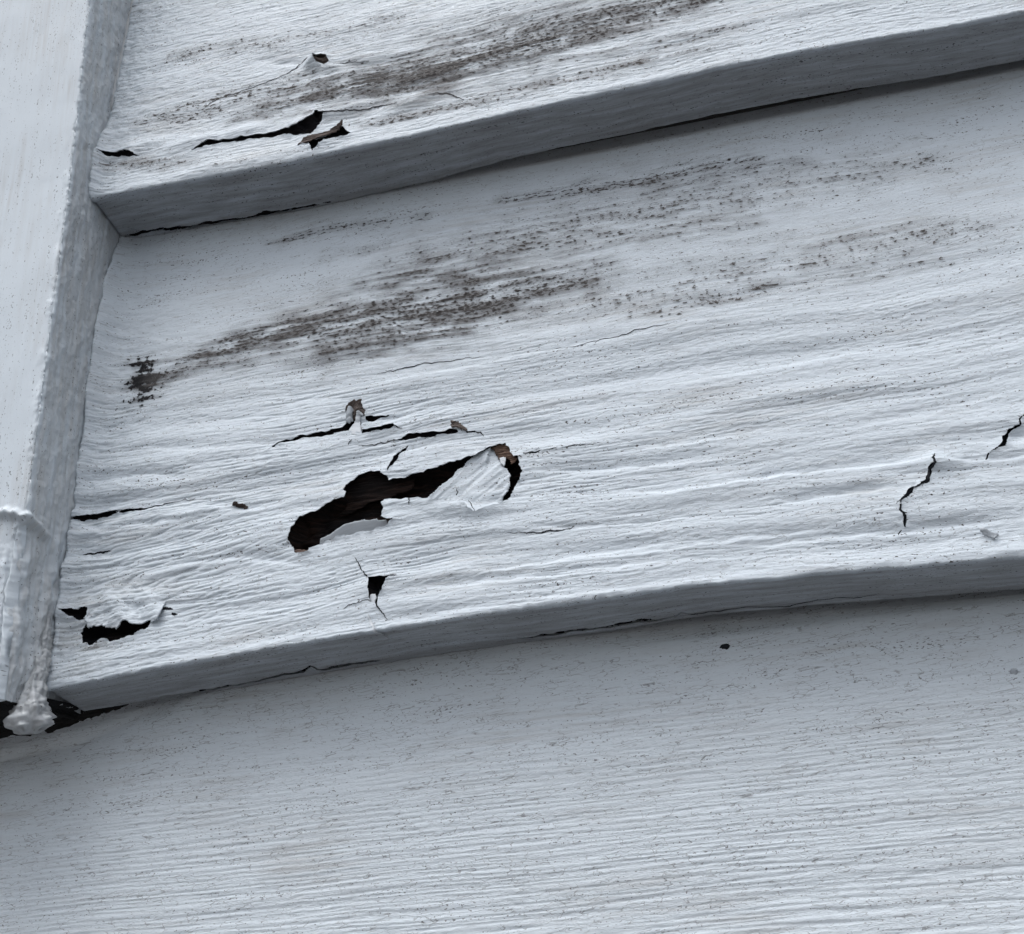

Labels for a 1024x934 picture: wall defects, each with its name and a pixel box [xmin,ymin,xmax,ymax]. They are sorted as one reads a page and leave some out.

peeling [297,119,351,150]
mould [115,150,996,411]
crack [985,415,1024,460]
crack [71,498,195,522]
peeling [287,443,527,553]
crack [896,453,937,535]
peeling [58,581,177,649]
peeling [345,558,396,620]